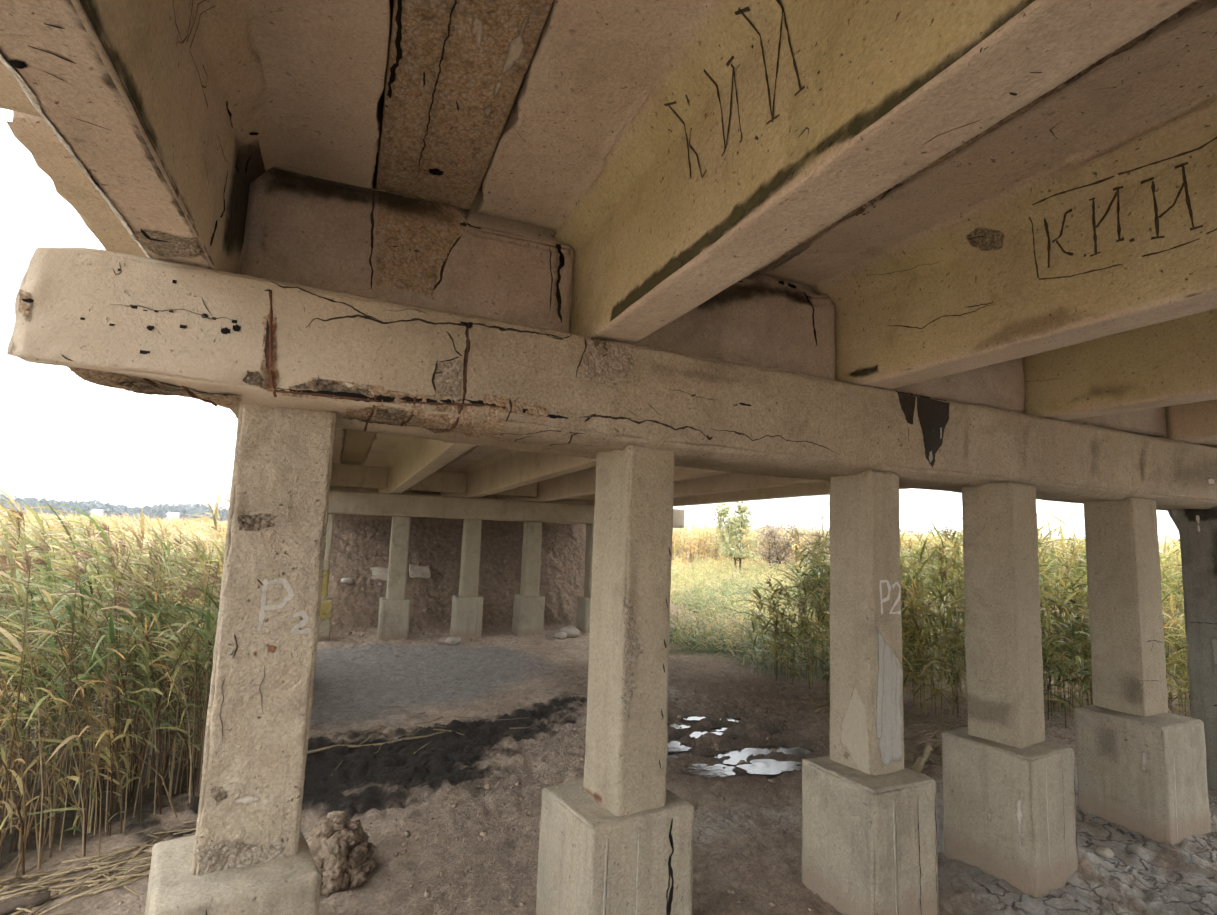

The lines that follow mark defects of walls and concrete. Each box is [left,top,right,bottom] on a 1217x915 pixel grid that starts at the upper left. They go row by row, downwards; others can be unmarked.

crack [385,0,459,175]
crack [271,202,572,356]
spalling [966,227,1004,251]
corrosion [264,289,277,397]
spalling [69,313,583,442]
crack [514,388,838,454]
damp [896,391,950,468]
crack [603,834,639,915]
crack [666,818,693,915]